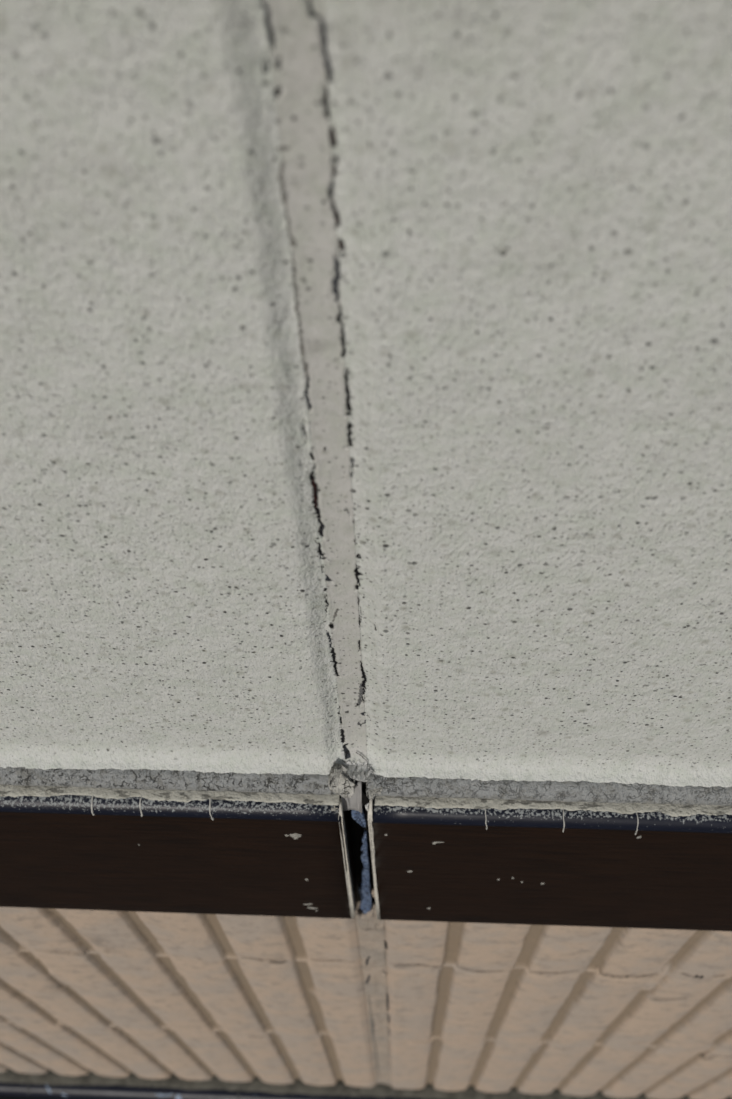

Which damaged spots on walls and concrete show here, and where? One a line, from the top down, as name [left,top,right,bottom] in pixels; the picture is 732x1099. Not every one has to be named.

crack [236,0,296,120]
crack [273,0,383,759]
peeling [341,751,377,782]